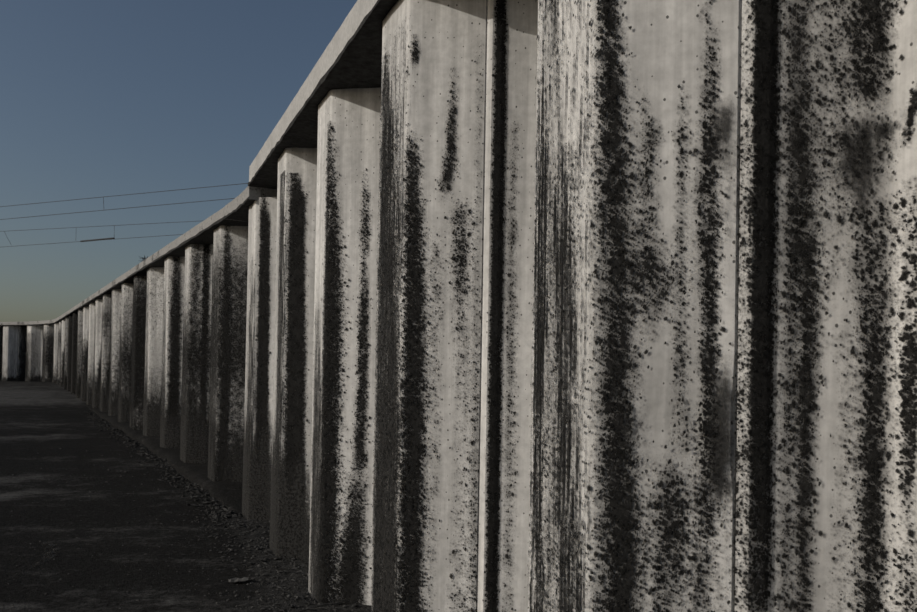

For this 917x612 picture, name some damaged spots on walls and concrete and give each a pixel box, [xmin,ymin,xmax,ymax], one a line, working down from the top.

leakage [713,107,738,164]
leakage [832,121,895,212]
leakage [706,372,734,502]